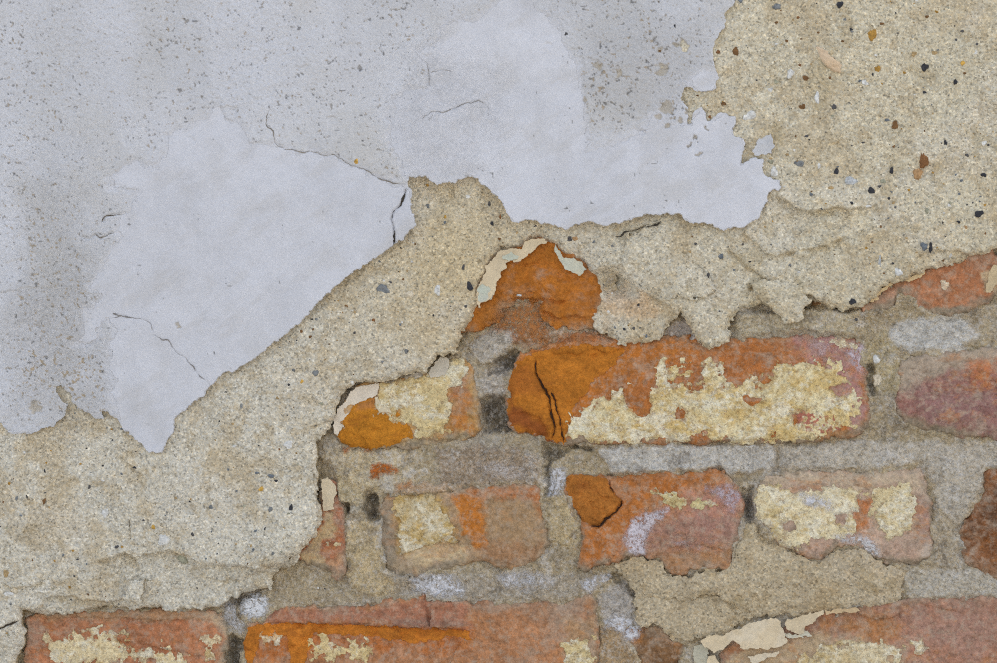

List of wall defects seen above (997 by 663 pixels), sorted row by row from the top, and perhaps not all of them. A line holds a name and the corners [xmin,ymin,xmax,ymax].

crack [266,111,406,243]
peeling [77,106,415,453]
peeling [476,238,548,308]
peeling [554,245,586,276]
flaking render [621,224,717,301]
flaking render [749,279,812,326]
peeling [337,357,469,450]
crack [535,362,564,442]
peeling [507,343,863,445]
flaking render [613,481,930,663]
peeling [42,624,190,663]
spalling [243,622,472,663]